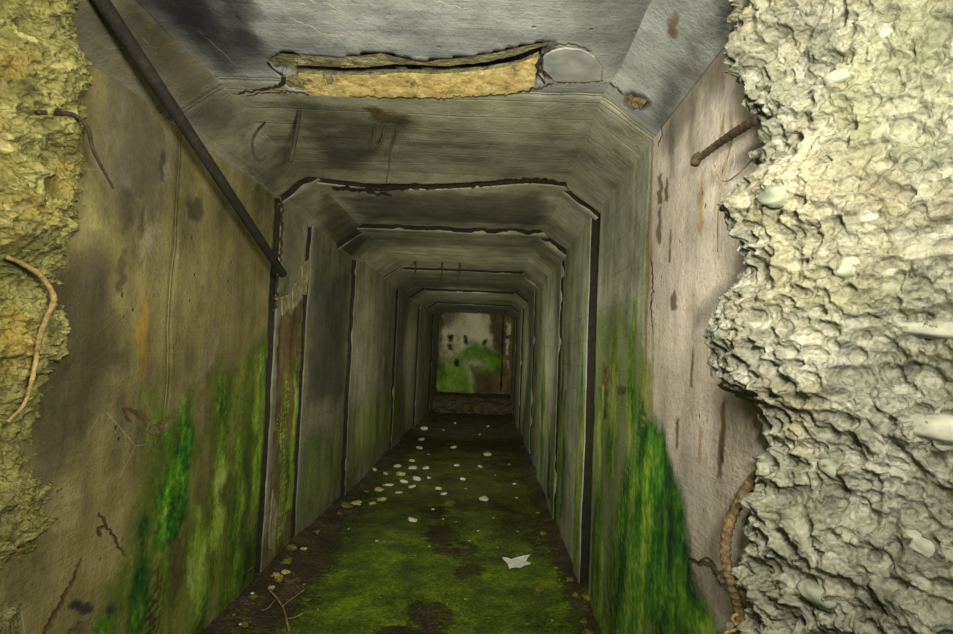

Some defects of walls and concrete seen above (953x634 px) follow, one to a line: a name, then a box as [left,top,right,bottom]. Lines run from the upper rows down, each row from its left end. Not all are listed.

corrosion [367,108,408,124]
spalling [232,42,553,101]
spalling [624,92,650,110]
crack [332,177,567,197]
corrosion [656,175,671,262]
water stain [128,348,265,634]
water stain [590,300,707,634]
crack [688,557,726,590]